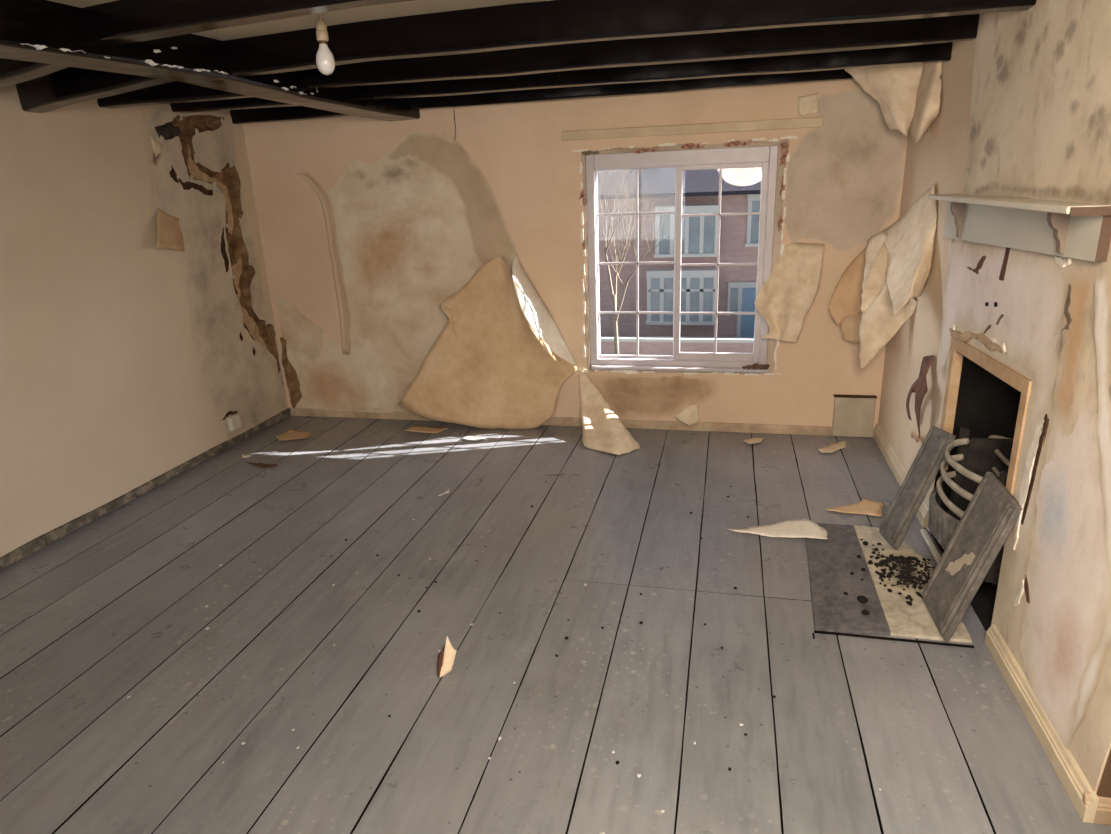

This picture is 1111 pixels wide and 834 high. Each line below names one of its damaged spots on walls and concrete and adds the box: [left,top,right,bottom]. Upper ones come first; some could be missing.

crack [152,113,302,408]
peeling [143,105,519,440]
leakage [339,154,454,342]
peeling [573,87,908,420]
mould [996,16,1079,88]
peeling [964,0,1111,199]
leakage [968,120,1111,204]
leakage [296,359,394,413]
leakage [618,376,702,399]
peeling [929,239,1111,792]
crack [1013,575,1030,606]
crack [1013,414,1049,550]